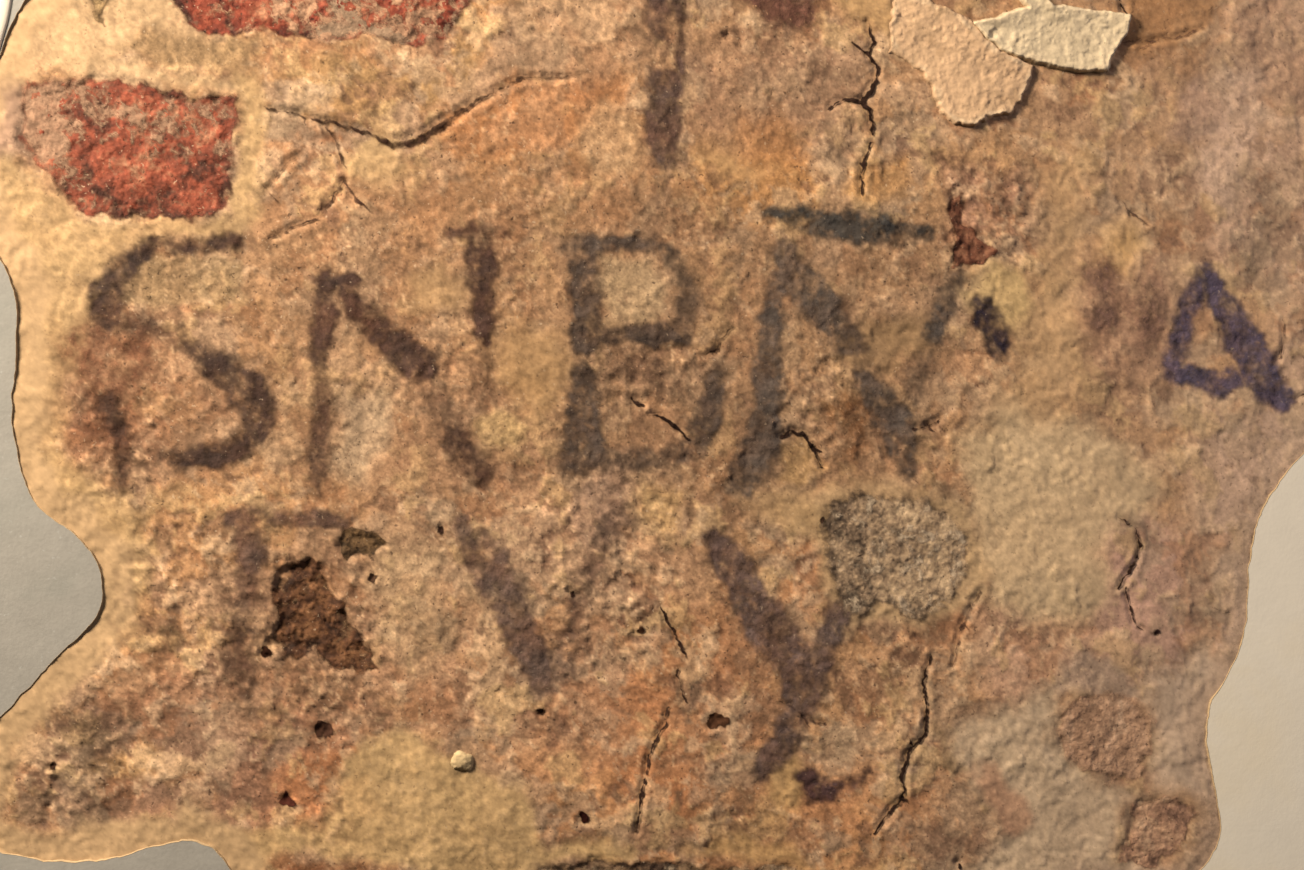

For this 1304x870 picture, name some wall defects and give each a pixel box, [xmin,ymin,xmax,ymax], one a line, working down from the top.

crack [263,76,567,239]
crack [828,26,880,196]
flaking render [888,0,1131,127]
spalling [270,558,378,674]
crack [1117,518,1143,630]
crack [635,607,687,833]
crack [873,591,981,835]